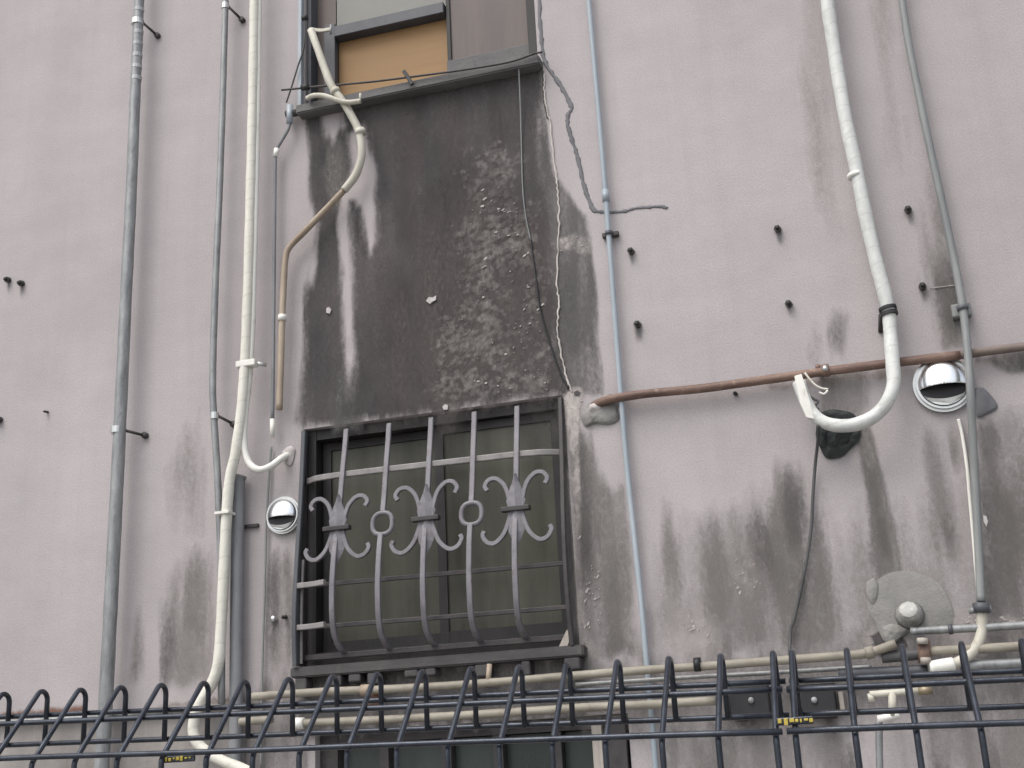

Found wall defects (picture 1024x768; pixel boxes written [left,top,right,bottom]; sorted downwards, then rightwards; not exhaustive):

water stain [541,135,599,391]
crack [538,0,668,392]
water stain [575,434,634,656]
water stain [768,481,838,684]
water stain [858,428,900,578]